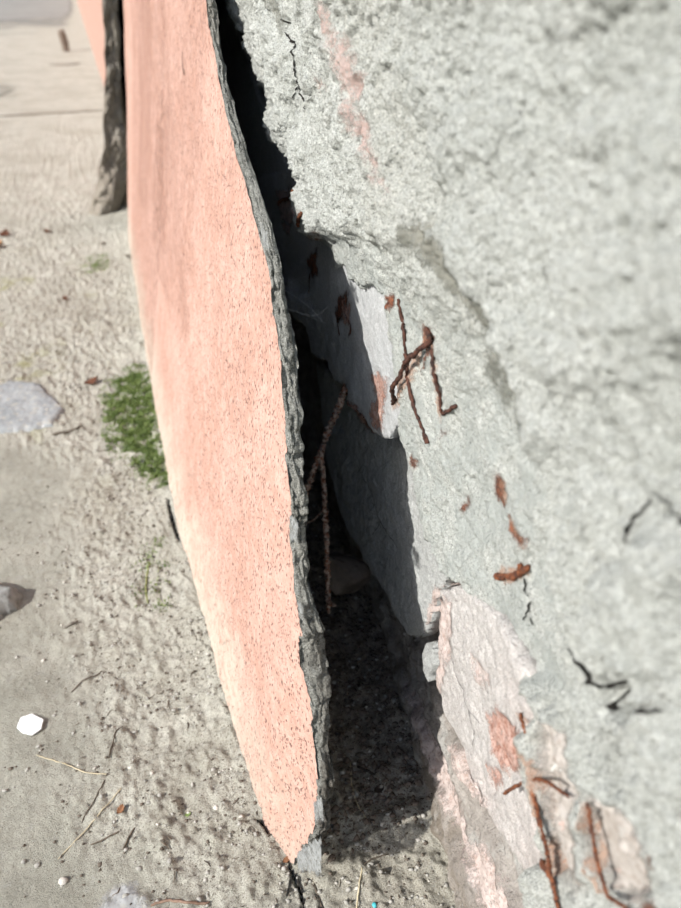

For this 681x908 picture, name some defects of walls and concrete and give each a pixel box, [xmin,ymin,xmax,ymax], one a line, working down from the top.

crack [280,19,305,109]
rust [335,290,351,336]
rust [384,293,394,310]
rust [392,325,435,409]
spalling [206,0,681,908]
rust [494,474,529,546]
crack [623,492,681,544]
crack [567,647,663,714]
rust [547,840,568,884]
rust [577,807,608,892]